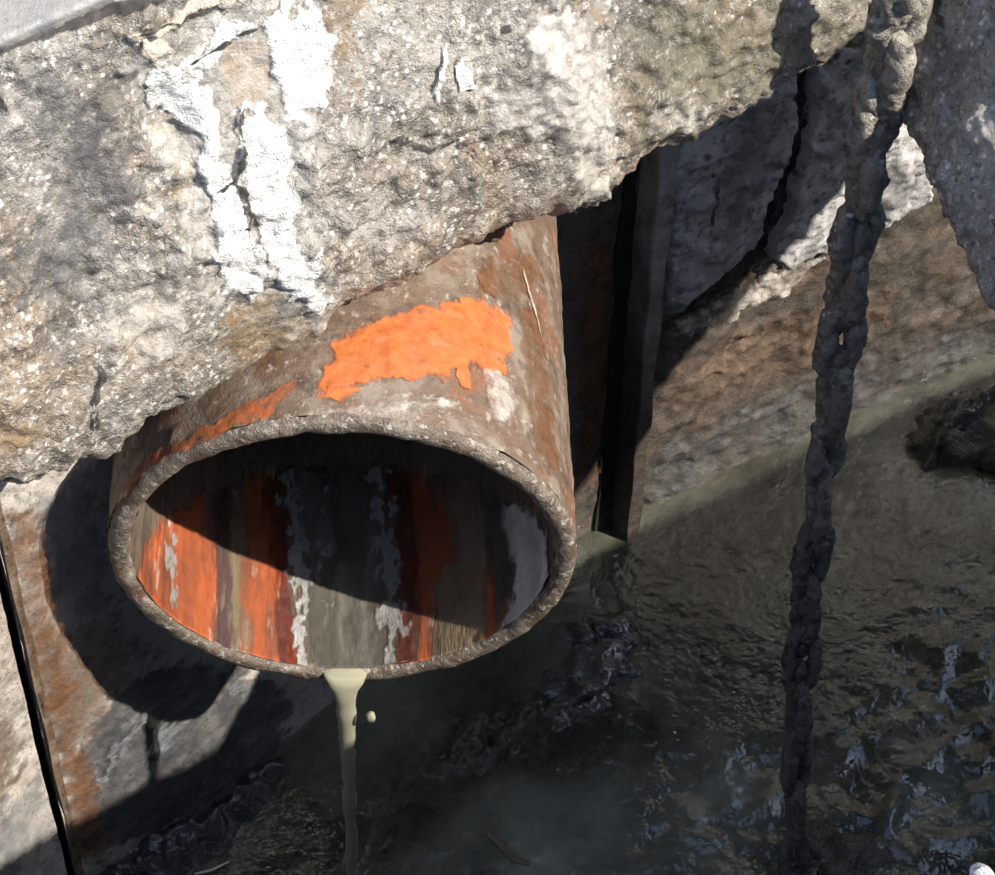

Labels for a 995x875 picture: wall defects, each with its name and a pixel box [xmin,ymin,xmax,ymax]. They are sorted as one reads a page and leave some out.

crack [217,103,260,255]
water stain [144,0,338,314]
crack [670,106,808,323]
efflorescence [145,307,182,359]
peeling [456,364,471,389]
corrosion [261,469,299,664]
corrosion [382,466,420,664]
corrosion [6,508,150,853]